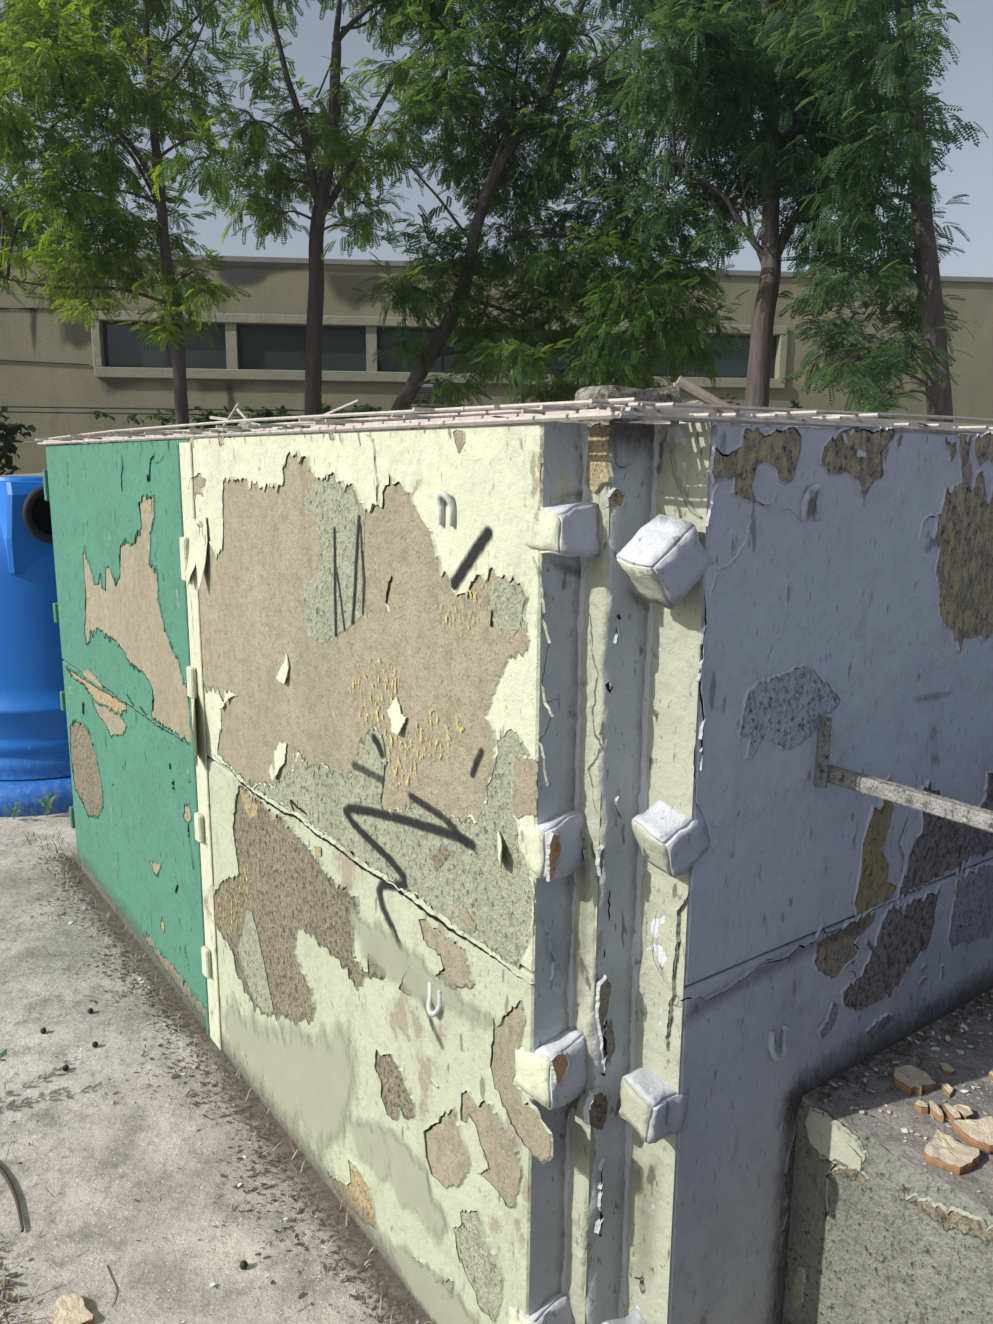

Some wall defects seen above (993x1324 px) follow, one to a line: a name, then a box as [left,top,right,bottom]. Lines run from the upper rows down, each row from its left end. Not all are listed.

peeling [453,428,466,454]
peeling [709,425,802,503]
peeling [819,427,902,494]
peeling [931,430,993,654]
peeling [65,665,127,820]
peeling [80,449,561,1026]
peeling [919,779,948,798]
peeling [978,771,993,811]
peeling [812,798,993,1040]
peeling [374,999,553,1209]
peeling [328,1158,377,1230]
peeling [409,1207,505,1323]